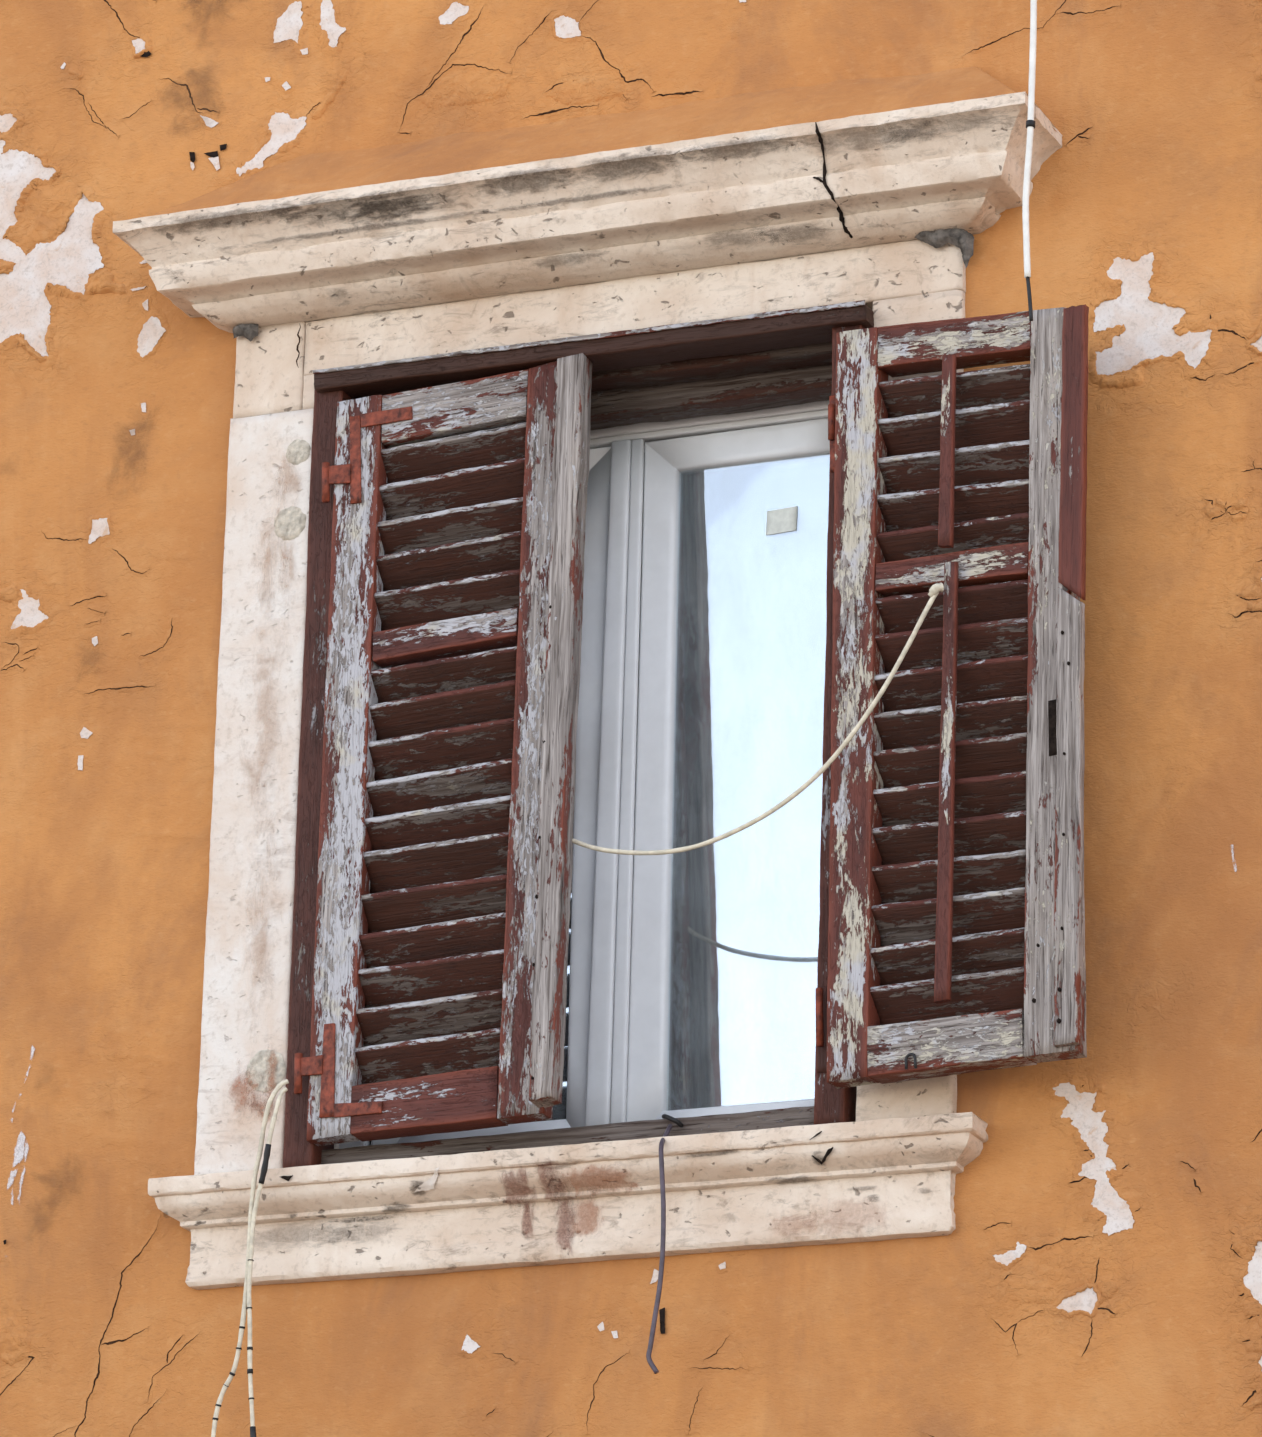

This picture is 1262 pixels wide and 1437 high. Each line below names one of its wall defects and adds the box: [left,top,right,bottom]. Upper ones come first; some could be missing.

peeling [0,107,116,368]
crack [100,0,157,39]
crack [63,74,221,140]
peeling [189,75,313,181]
peeling [270,0,355,58]
crack [394,0,704,138]
crack [813,122,853,238]
peeling [1083,240,1223,385]
peeling [1045,1069,1147,1246]
crack [47,1214,203,1437]
crack [982,1217,1118,1359]
peeling [1232,1235,1262,1395]